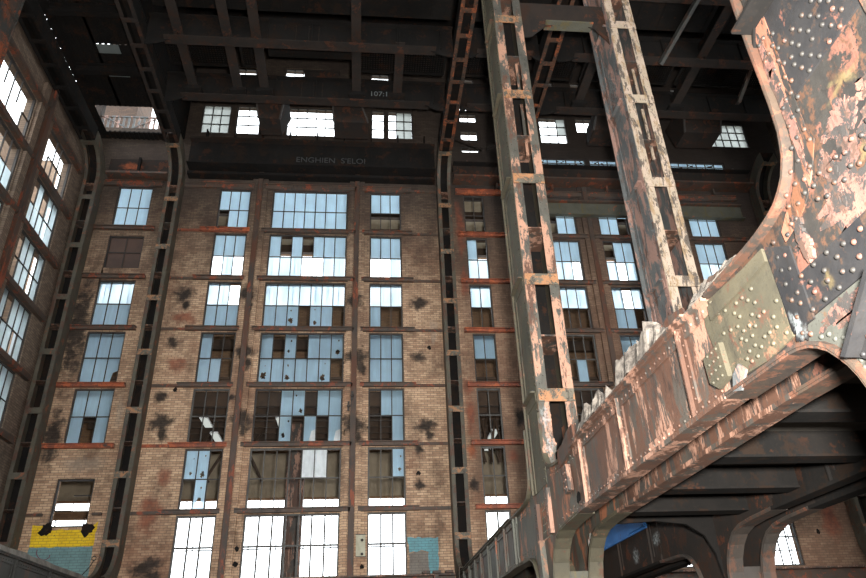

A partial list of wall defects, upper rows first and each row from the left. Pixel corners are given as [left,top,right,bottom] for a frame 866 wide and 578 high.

leakage [154,424,171,444]
leakage [129,569,168,578]